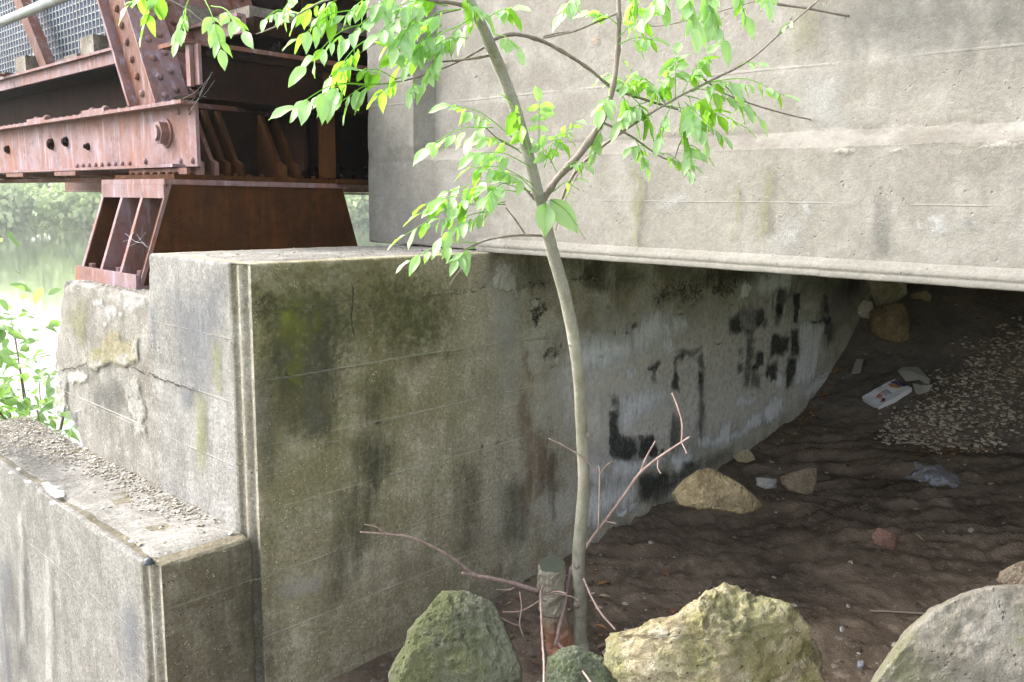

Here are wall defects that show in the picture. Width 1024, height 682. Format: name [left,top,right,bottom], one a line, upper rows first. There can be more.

spalling [52,298,145,434]
crack [54,342,197,392]